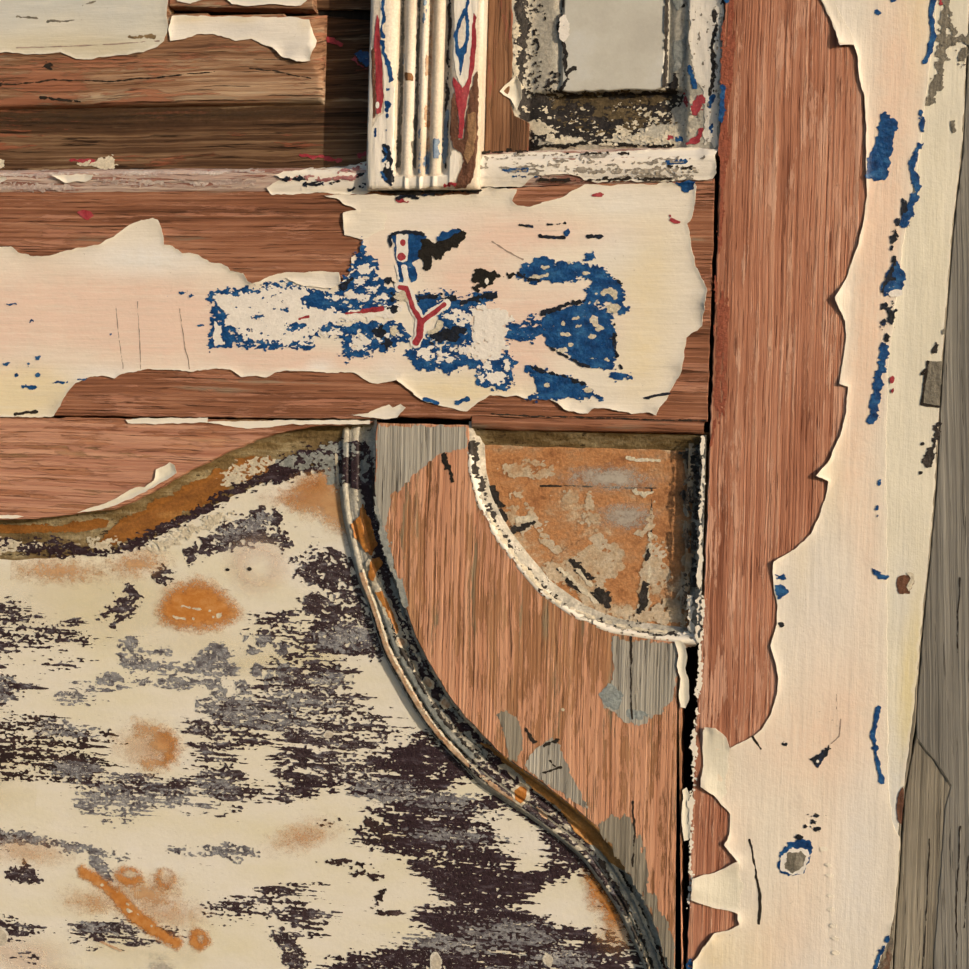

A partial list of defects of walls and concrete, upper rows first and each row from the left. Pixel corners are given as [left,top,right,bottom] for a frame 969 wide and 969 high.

peeling [0,0,724,417]
peeling [78,462,177,513]
rust [158,579,239,630]
rust [287,472,408,648]
peeling [126,404,707,726]
peeling [682,0,969,969]
peeling [496,710,588,809]
rust [78,865,211,951]
peeling [596,813,675,969]